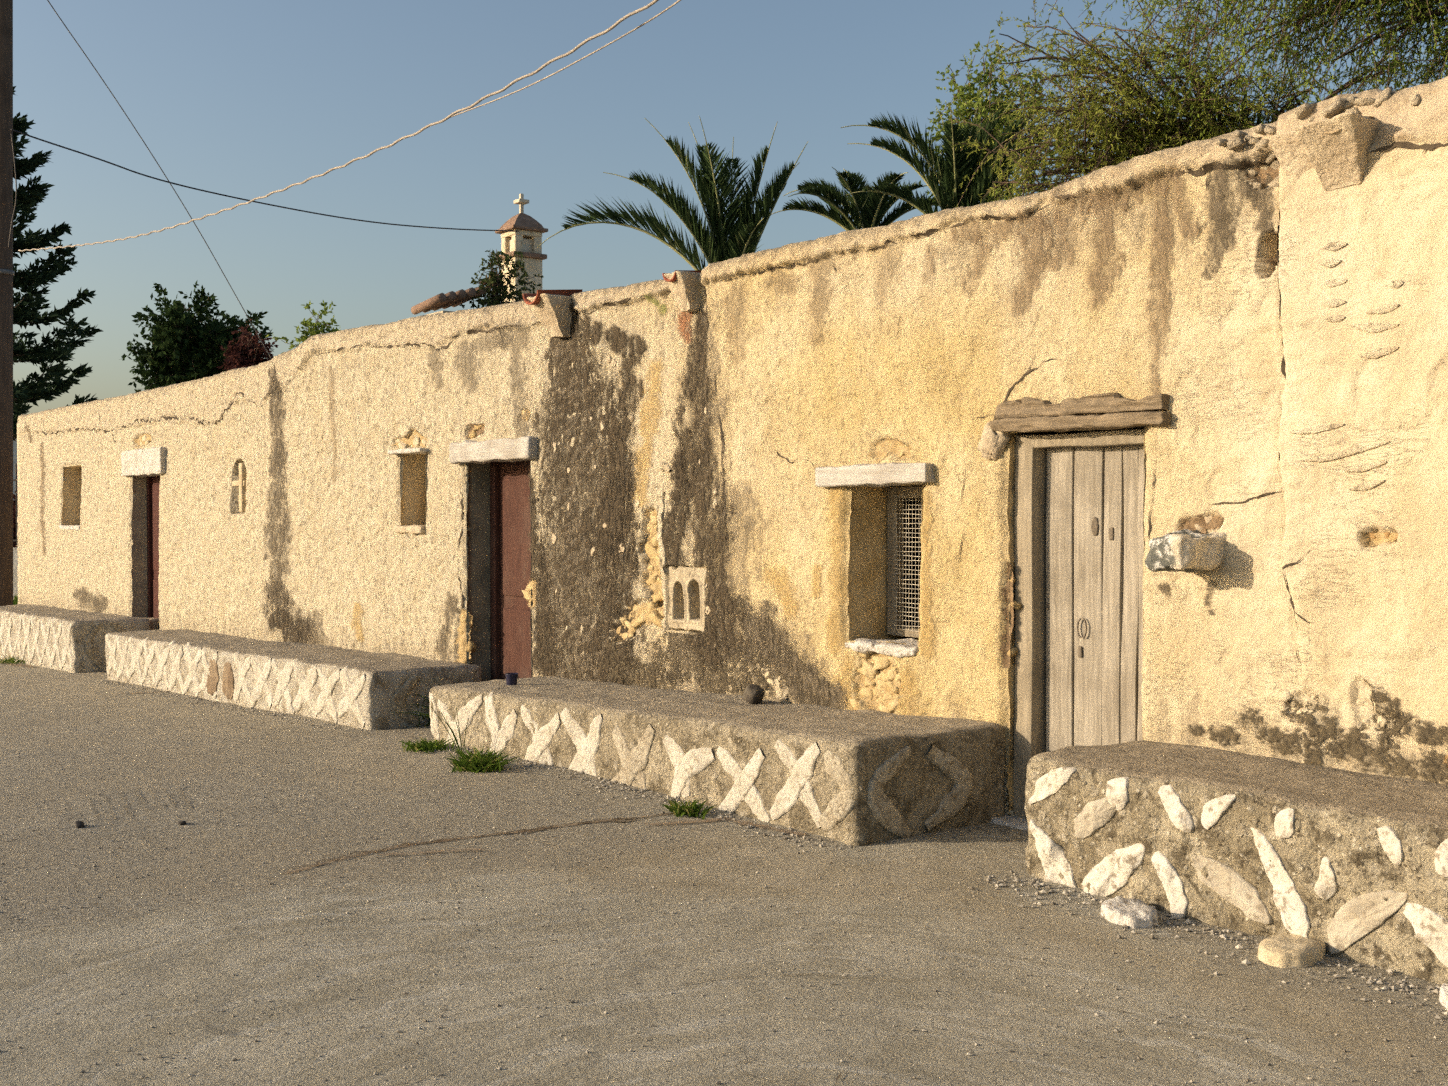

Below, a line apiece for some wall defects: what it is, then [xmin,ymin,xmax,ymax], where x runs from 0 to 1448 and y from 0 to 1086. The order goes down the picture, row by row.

water stain [949,154,1276,396]
crack [1277,211,1286,404]
water stain [263,368,327,645]
spalling [613,500,664,642]
water stain [527,305,861,710]
spalling [850,641,903,713]
water stain [919,490,935,659]
crack [1282,548,1312,677]
water stain [1188,683,1448,785]
hole [1360,528,1398,547]